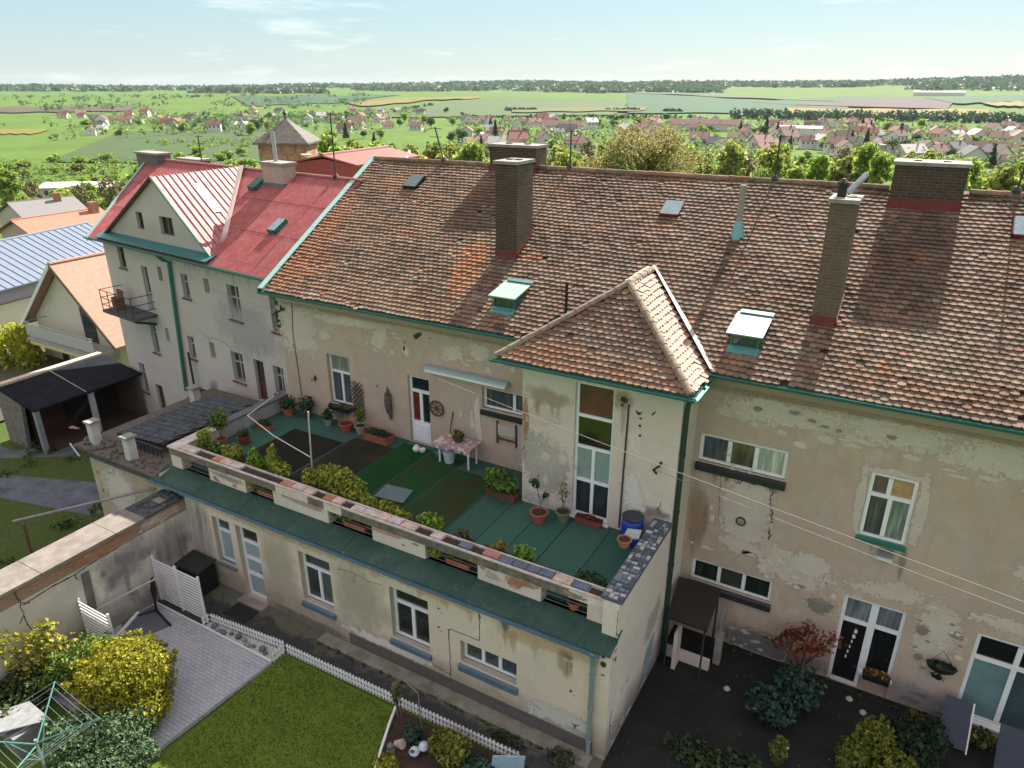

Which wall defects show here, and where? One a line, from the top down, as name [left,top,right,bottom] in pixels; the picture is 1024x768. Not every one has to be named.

peeling [307,314,516,374]
peeling [698,391,1024,493]
crack [767,488,775,539]
crack [14,548,118,630]
flaking render [504,575,539,590]
peeling [690,534,1024,681]
crack [432,613,481,676]